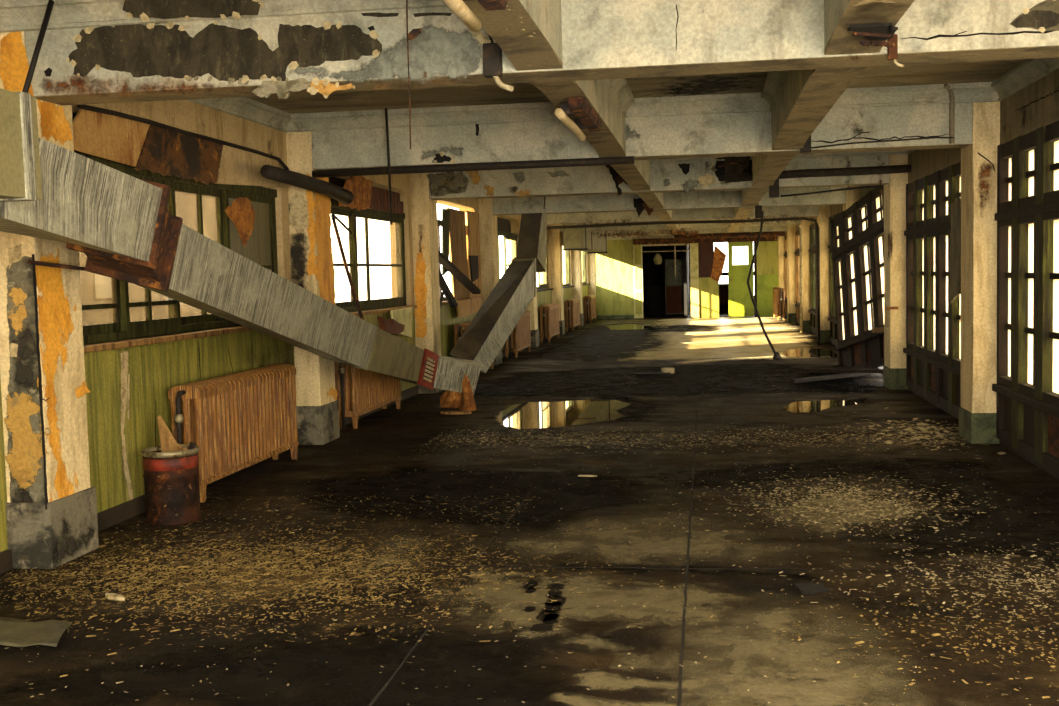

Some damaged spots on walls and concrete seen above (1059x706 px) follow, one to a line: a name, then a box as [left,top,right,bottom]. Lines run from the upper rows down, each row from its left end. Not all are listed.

peeling [66,0,399,99]
peeling [408,12,452,40]
crack [901,30,1056,40]
peeling [1010,0,1059,33]
peeling [0,31,73,145]
crack [812,132,947,143]
crack [973,152,995,208]
peeling [4,248,80,502]
peeling [75,381,90,398]